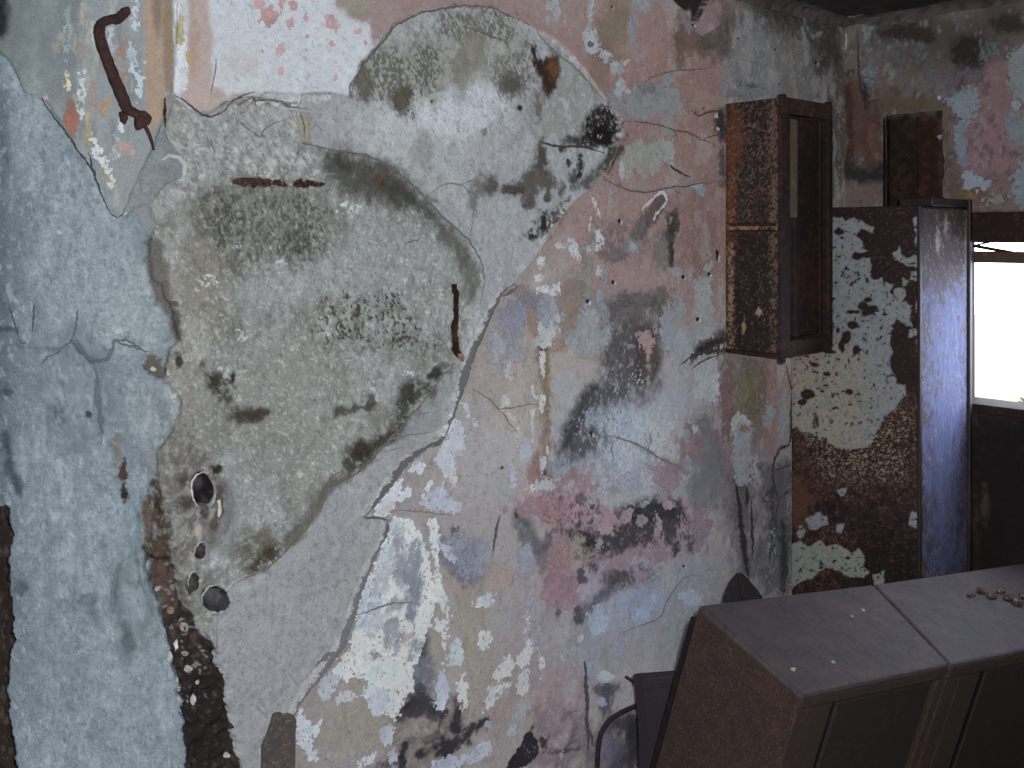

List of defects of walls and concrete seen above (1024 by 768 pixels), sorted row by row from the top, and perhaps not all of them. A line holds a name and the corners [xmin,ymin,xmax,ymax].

crack [351,4,725,150]
rust [531,45,560,96]
crack [539,141,605,153]
peeling [916,39,1024,210]
damp [324,153,477,299]
damp [201,362,270,423]
crack [163,61,540,716]
spalling [0,0,726,768]
damp [312,290,436,349]
rust [141,480,177,558]
damp [514,493,628,624]
crack [736,366,792,586]